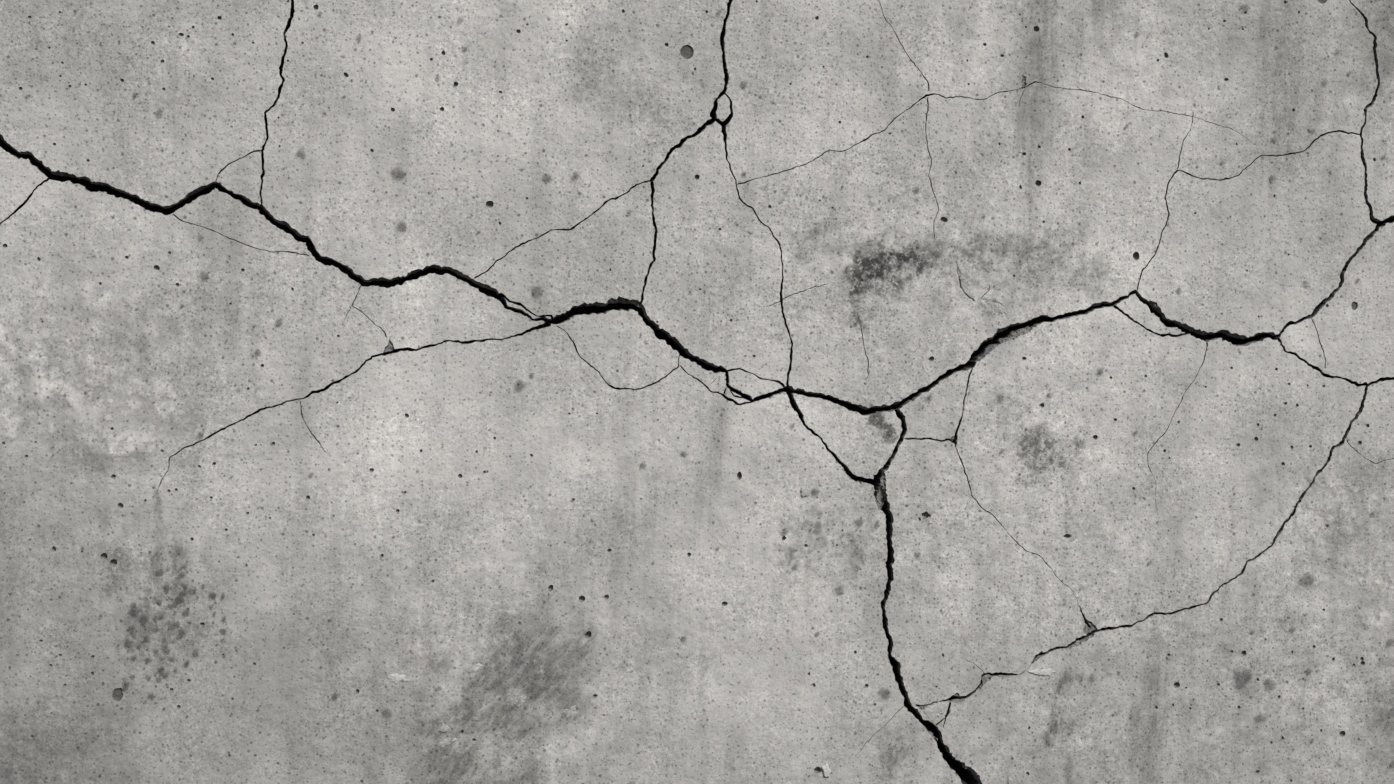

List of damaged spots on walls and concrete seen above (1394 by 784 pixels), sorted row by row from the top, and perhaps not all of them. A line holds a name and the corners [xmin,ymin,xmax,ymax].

crack [0,0,1394,601]
crack [786,393,1027,784]
crack [1028,668,1056,676]
crack [1031,338,1394,665]